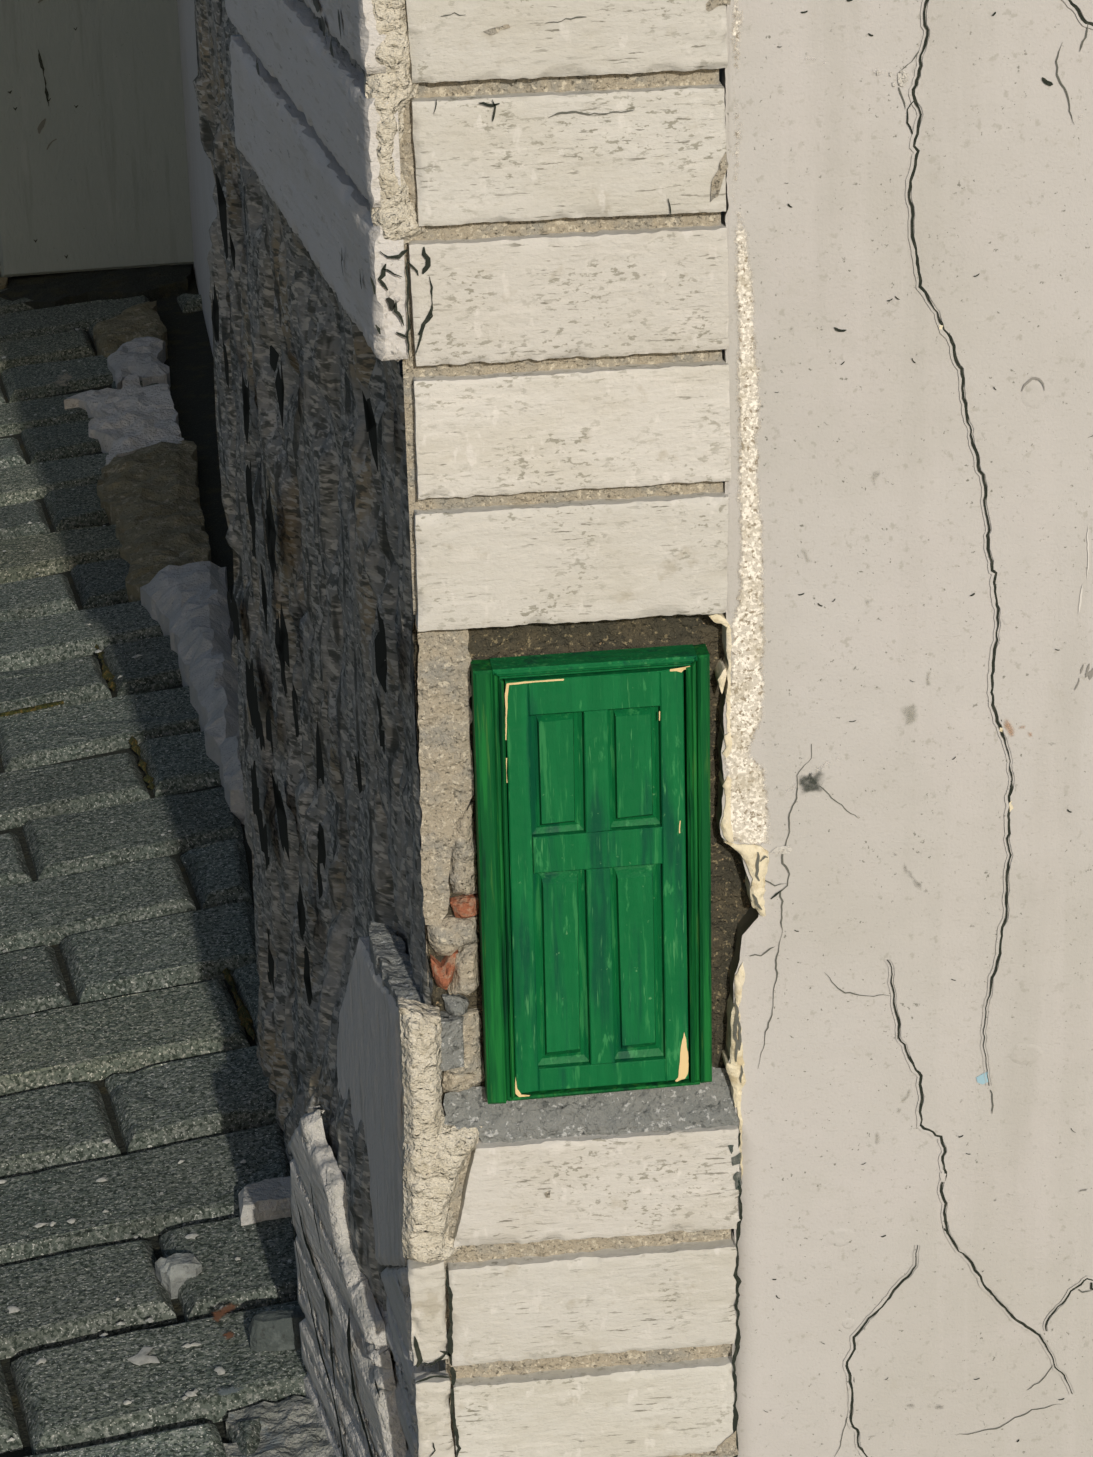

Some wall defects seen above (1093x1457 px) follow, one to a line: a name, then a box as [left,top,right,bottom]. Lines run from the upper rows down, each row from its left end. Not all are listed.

crack [313,0,341,58]
crack [1055,0,1093,125]
crack [341,247,433,360]
crack [898,0,1015,1113]
peeling [708,613,792,917]
flaking render [427,800,485,1092]
peeling [722,962,746,1190]
crack [828,959,1093,1457]